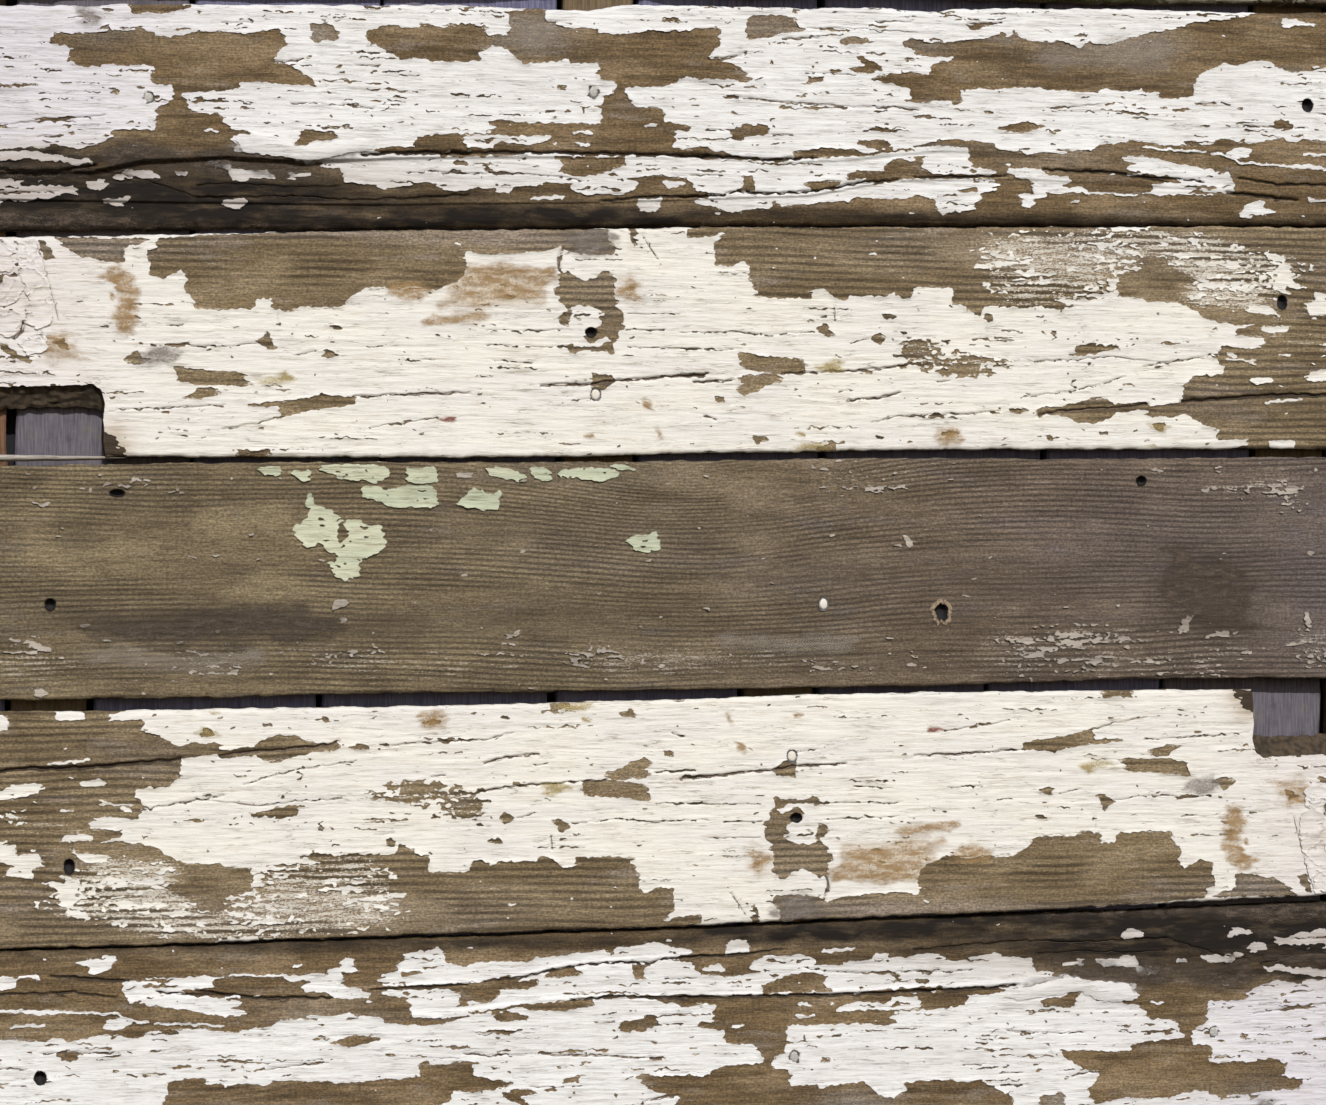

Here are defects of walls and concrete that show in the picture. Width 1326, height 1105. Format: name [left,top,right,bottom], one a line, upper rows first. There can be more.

peeling [0,4,1326,450]
peeling [104,432,126,457]
peeling [235,449,272,457]
peeling [816,440,845,452]
peeling [541,702,570,714]
peeling [1100,690,1134,698]
peeling [1233,689,1254,712]
crack [915,720,1017,788]
crack [149,742,353,810]
crack [383,735,896,849]
peeling [0,711,1326,1105]